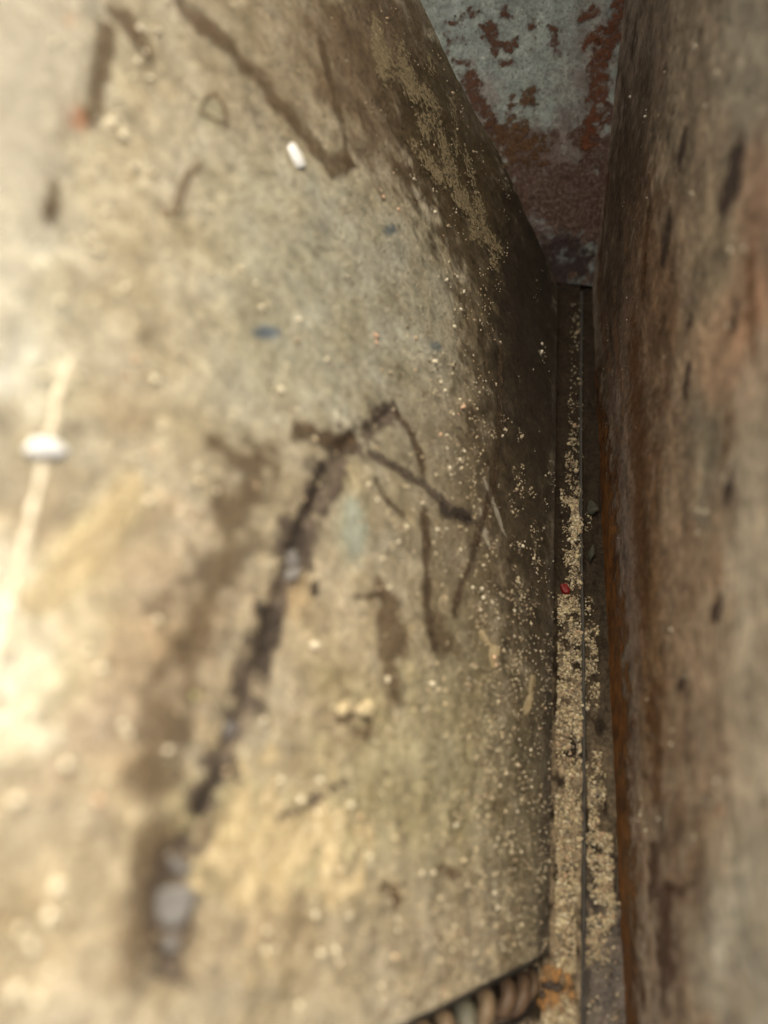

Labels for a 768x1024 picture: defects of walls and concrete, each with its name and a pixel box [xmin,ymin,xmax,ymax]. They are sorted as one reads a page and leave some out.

corrosion [451,57,550,172]
corrosion [444,5,559,68]
corrosion [577,0,625,154]
crack [138,348,504,983]
corrosion [595,366,662,1024]